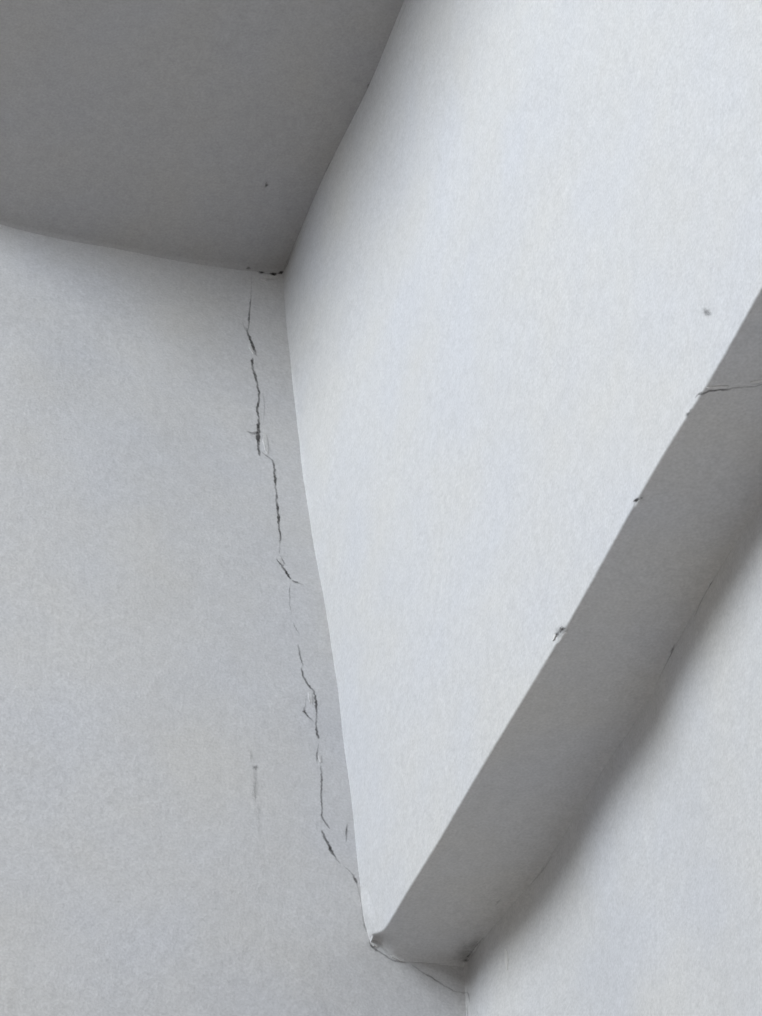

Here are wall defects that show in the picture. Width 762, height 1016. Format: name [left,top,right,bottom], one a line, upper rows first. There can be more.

crack [249,317,290,577]
crack [303,684,322,763]